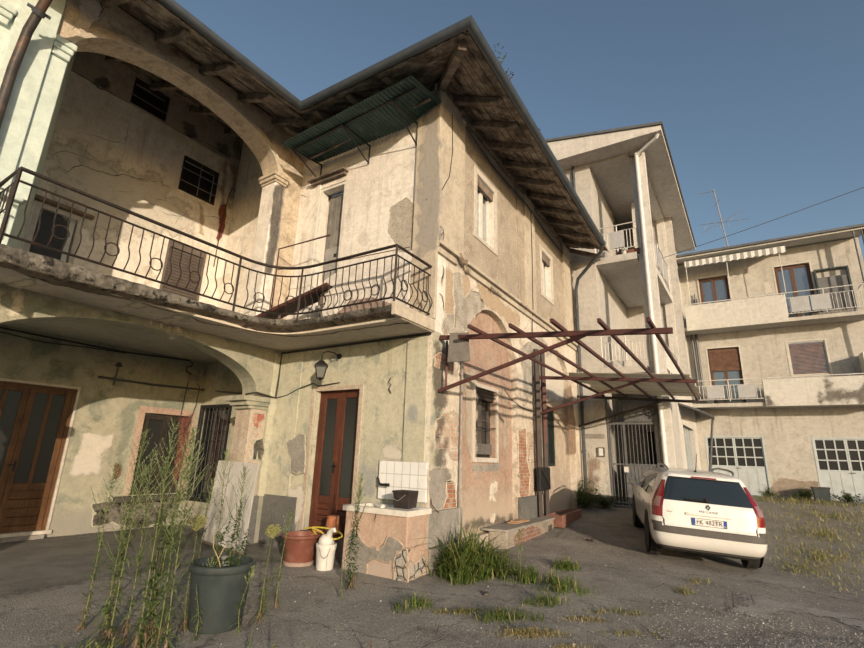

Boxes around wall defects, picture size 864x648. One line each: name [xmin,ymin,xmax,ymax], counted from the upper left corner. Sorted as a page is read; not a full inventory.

crack [51,70,229,224]
spalling [0,261,410,337]
flaking render [441,271,485,335]
flaking render [251,411,265,461]
flaking render [286,433,306,524]
flaking render [434,410,460,509]
flaking render [489,479,498,524]
flaking render [518,428,537,497]
flaking render [344,531,412,574]